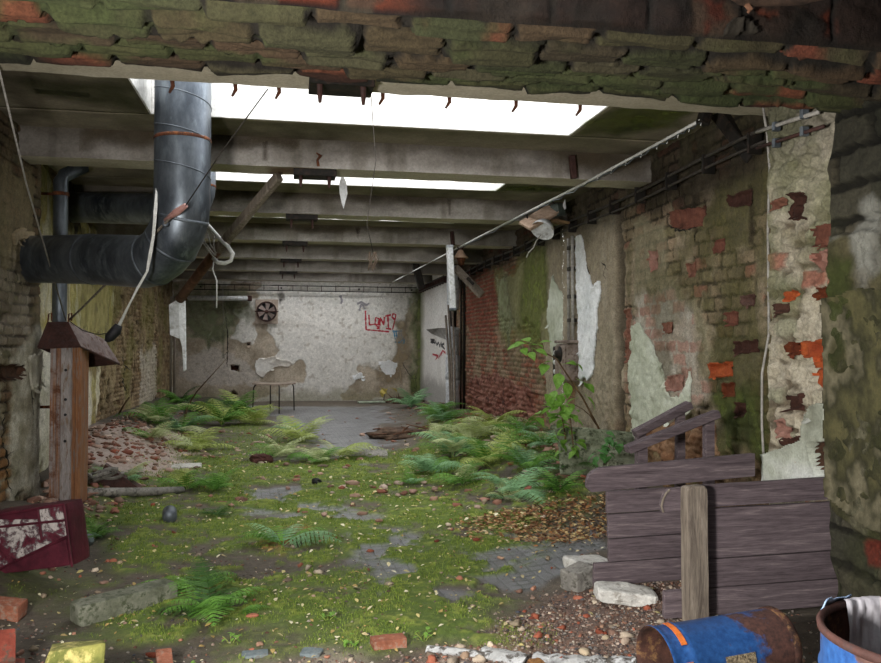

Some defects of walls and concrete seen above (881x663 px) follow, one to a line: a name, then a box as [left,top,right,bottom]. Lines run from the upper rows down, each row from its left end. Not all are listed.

spalling [669,205,707,230]
flaking render [12,228,35,247]
flaking render [574,235,601,386]
spalling [623,308,632,363]
spalling [661,322,673,335]
flaking render [0,351,46,393]
peeling [255,356,292,378]
peeling [378,360,397,377]
spalling [660,374,685,392]
spalling [707,339,760,418]